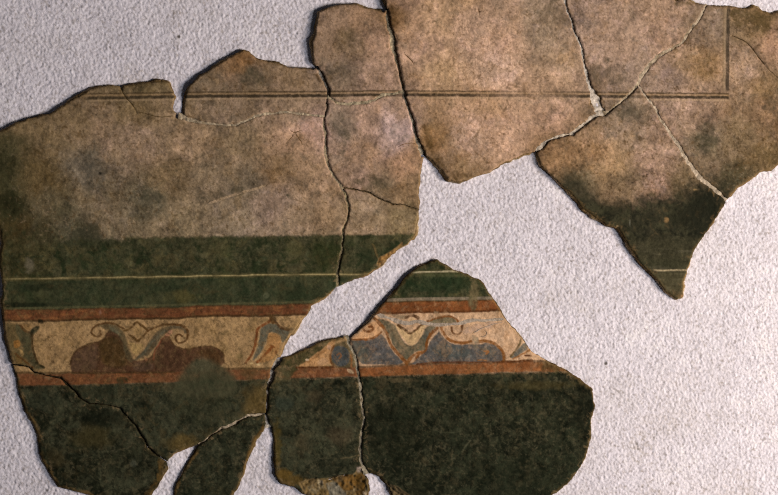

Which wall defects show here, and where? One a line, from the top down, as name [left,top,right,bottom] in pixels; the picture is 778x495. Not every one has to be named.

crack [386,10,424,155]
crack [535,0,727,201]
crack [122,68,419,287]
crack [13,364,167,462]
crack [198,358,281,445]
crack [343,335,369,475]